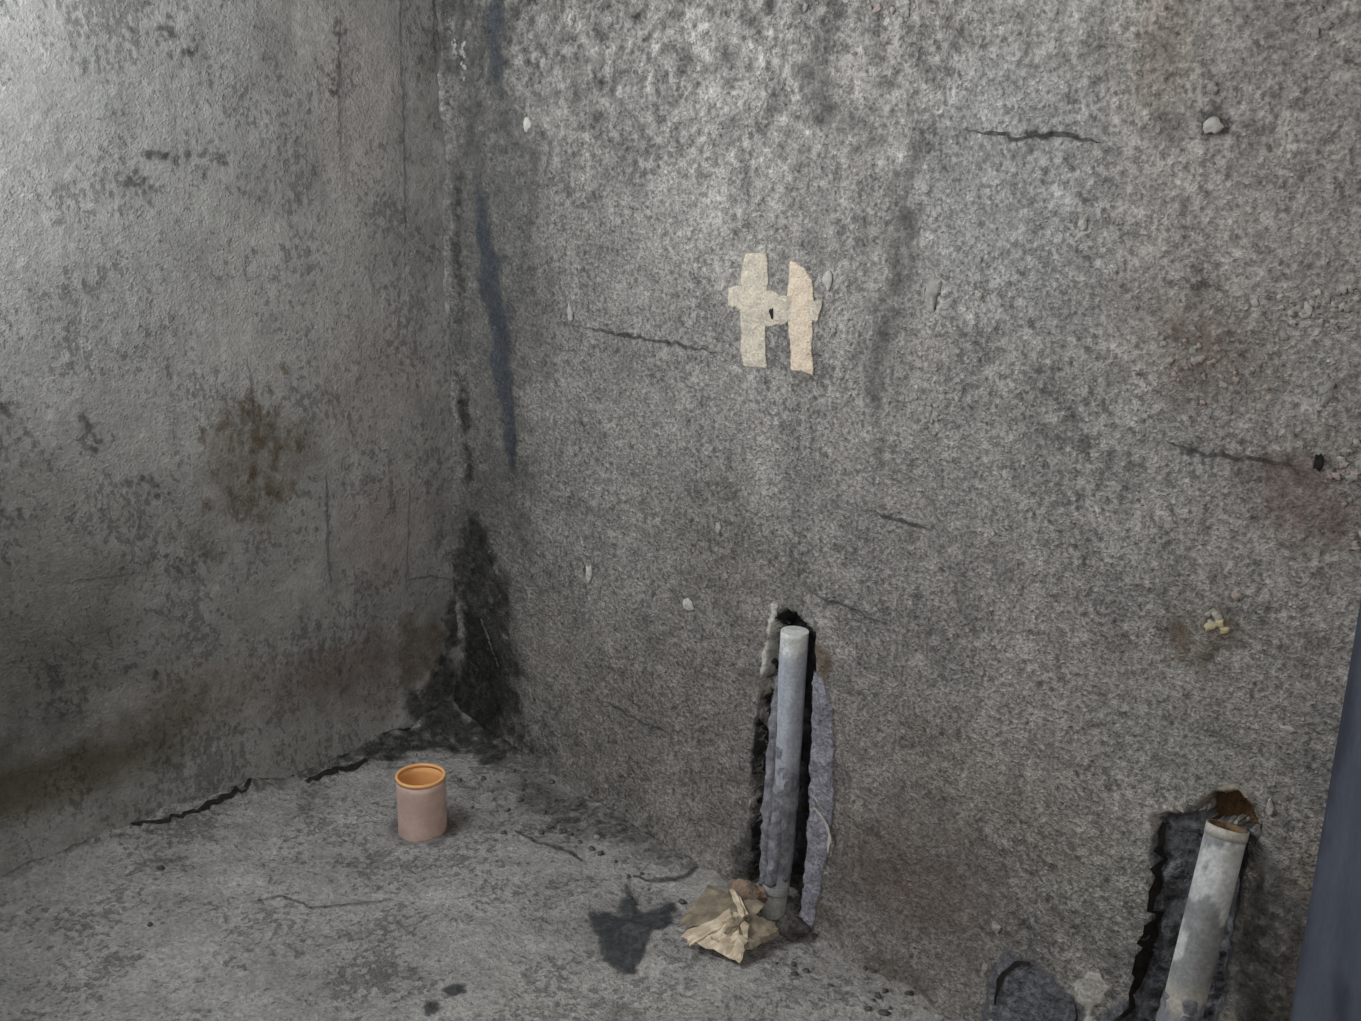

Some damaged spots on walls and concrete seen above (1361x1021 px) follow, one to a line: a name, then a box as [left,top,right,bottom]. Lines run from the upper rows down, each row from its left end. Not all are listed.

crack [965,129,1102,143]
leakage [476,196,516,469]
crack [572,324,717,353]
leakage [458,387,473,480]
crack [1166,441,1305,477]
leakage [339,518,534,764]
spalling [759,602,785,694]
crack [130,727,411,825]
spalling [1161,801,1213,813]